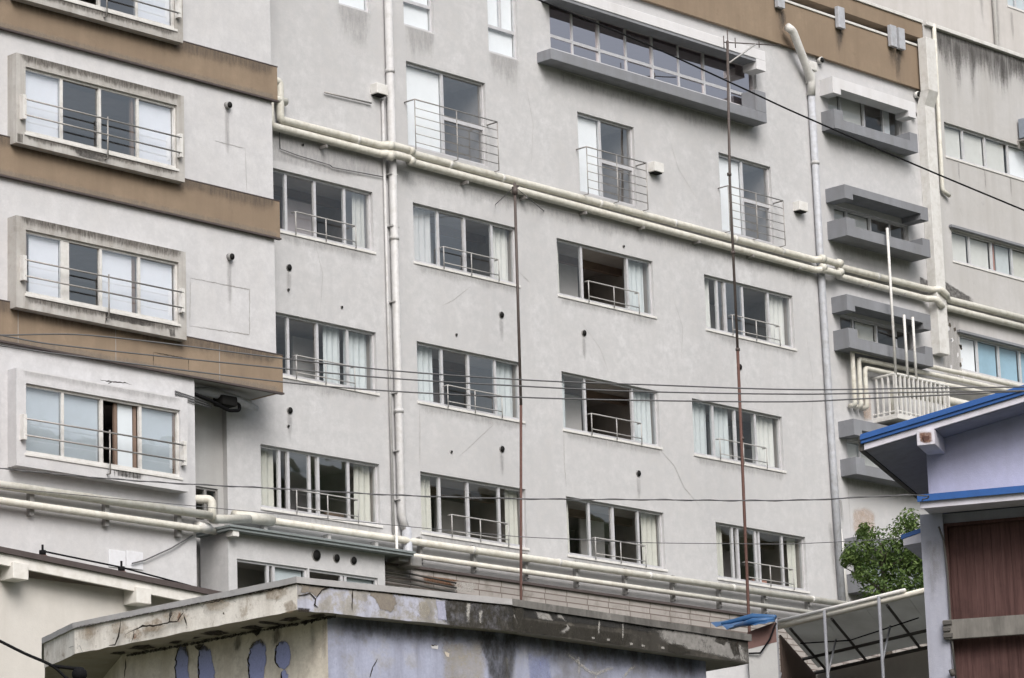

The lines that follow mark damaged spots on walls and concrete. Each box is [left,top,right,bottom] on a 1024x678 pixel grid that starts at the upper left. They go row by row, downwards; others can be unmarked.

water stain [937,31,1024,81]
peeling [111,608,336,678]
crack [109,585,353,677]
peeling [301,585,326,596]
water stain [75,583,694,678]
peeling [370,591,421,612]